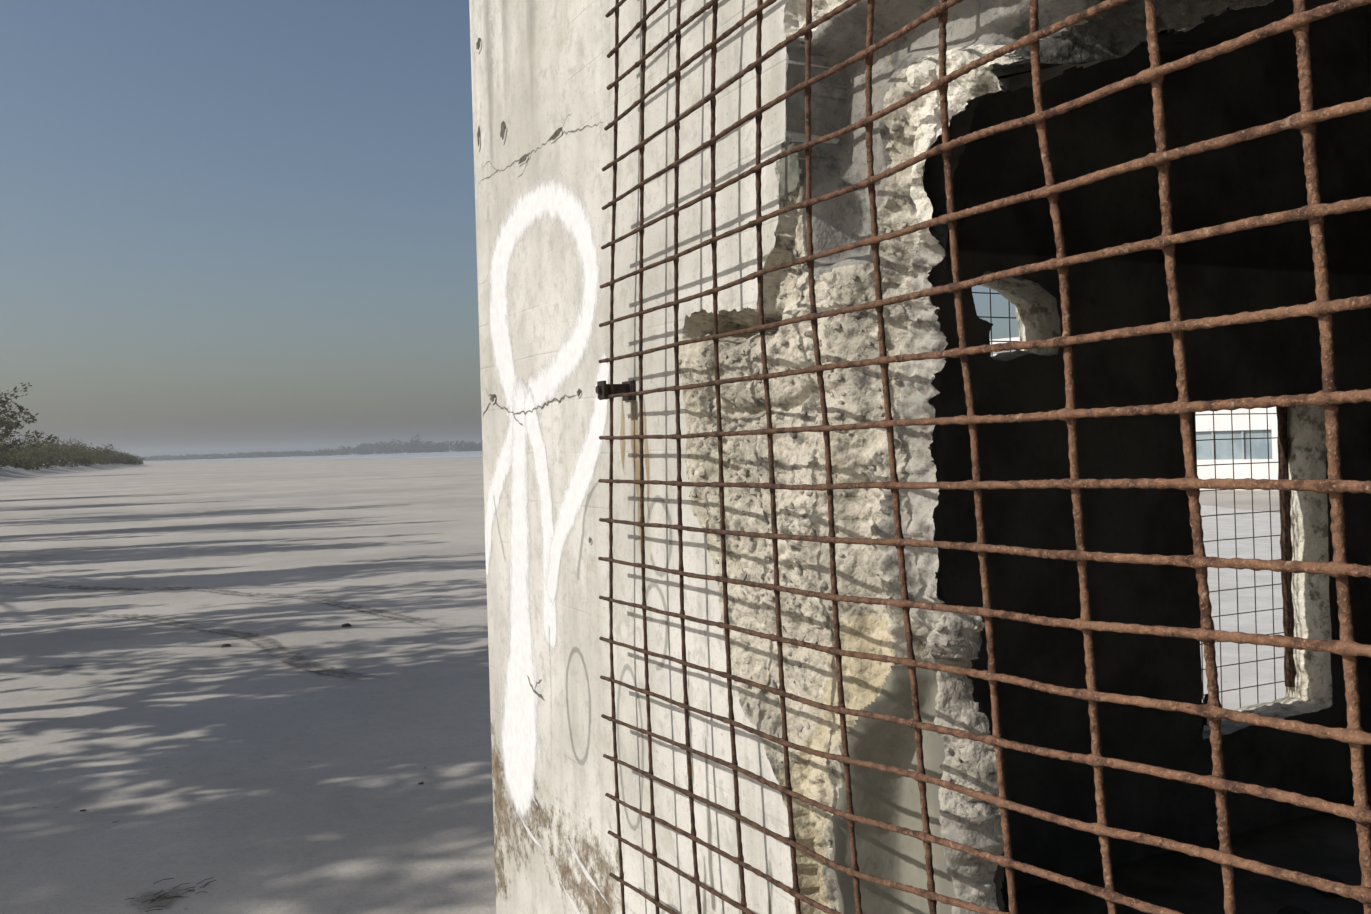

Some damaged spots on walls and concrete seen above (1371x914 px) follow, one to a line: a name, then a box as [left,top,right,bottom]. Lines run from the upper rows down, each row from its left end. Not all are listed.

spalling [783,0,846,38]
crack [479,114,603,184]
crack [482,388,575,425]
corrosion [620,400,649,546]
spalling [679,43,1024,914]